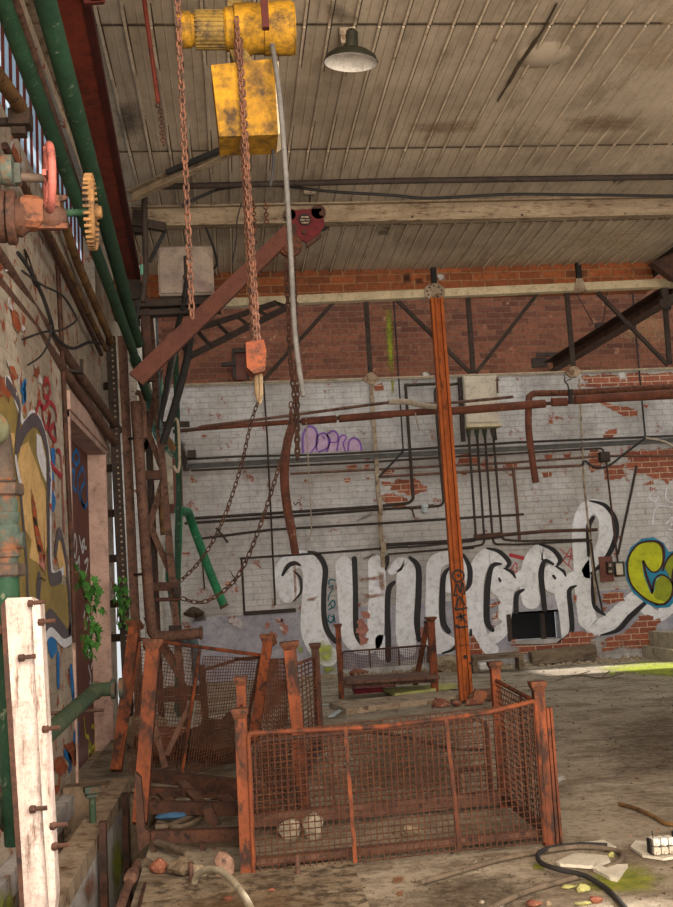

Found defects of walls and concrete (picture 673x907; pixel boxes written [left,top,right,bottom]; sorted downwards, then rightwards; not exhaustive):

spalling [578,372,673,388]
spalling [601,403,648,417]
spalling [588,447,673,485]
spalling [381,470,427,507]
spalling [508,615,661,654]